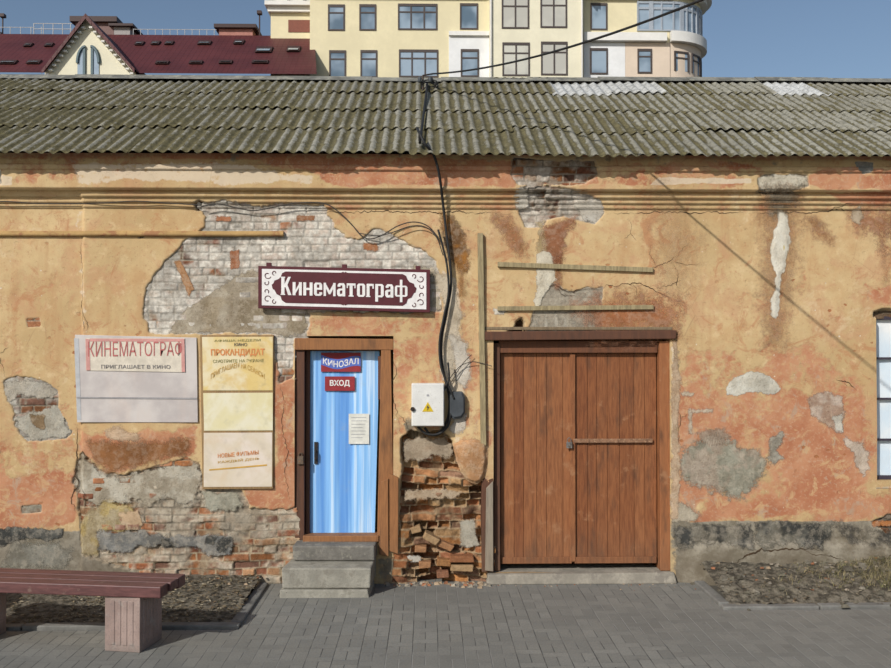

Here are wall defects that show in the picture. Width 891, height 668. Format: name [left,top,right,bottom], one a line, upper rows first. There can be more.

flaking render [143,200,471,388]
flaking render [527,220,603,331]
peeling [770,212,791,318]
flaking render [4,376,72,441]
flaking render [0,453,300,585]
flaking render [392,413,496,584]
peeling [670,342,891,551]